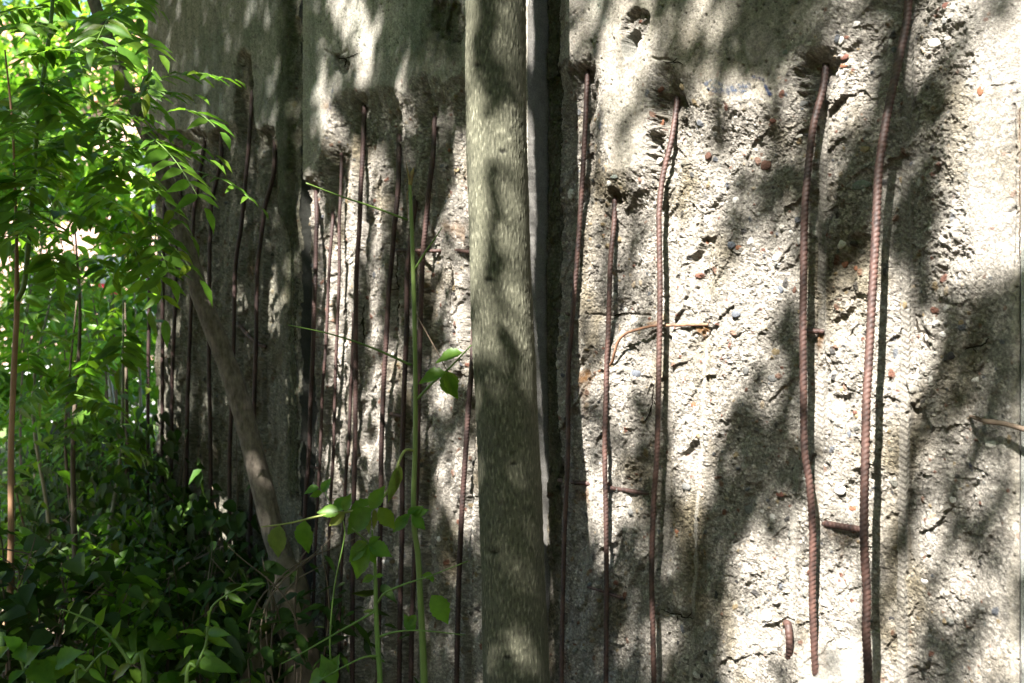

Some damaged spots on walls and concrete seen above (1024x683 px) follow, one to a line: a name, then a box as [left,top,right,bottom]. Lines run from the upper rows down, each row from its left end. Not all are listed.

spalling [152,0,483,683]
spalling [546,0,1021,683]